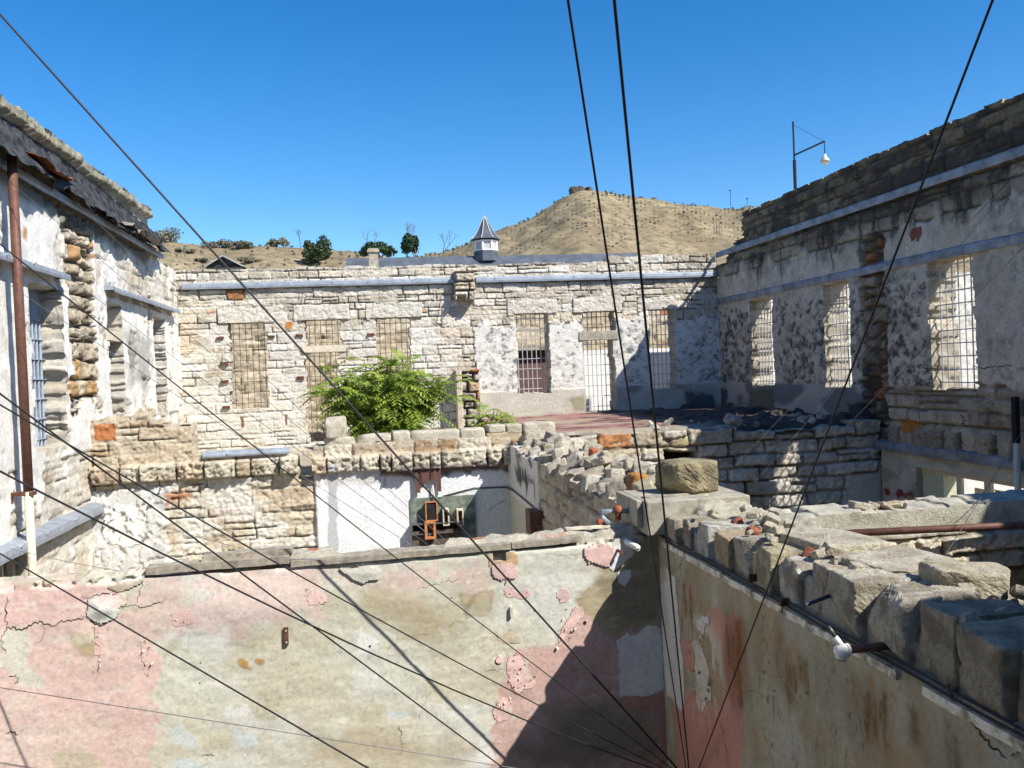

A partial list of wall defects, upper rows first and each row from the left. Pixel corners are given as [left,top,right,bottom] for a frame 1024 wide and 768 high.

peeling [487,552,531,599]
peeling [584,540,636,586]
crack [0,582,161,650]
peeling [556,589,586,649]
peeling [492,628,536,724]
peeling [616,575,716,766]